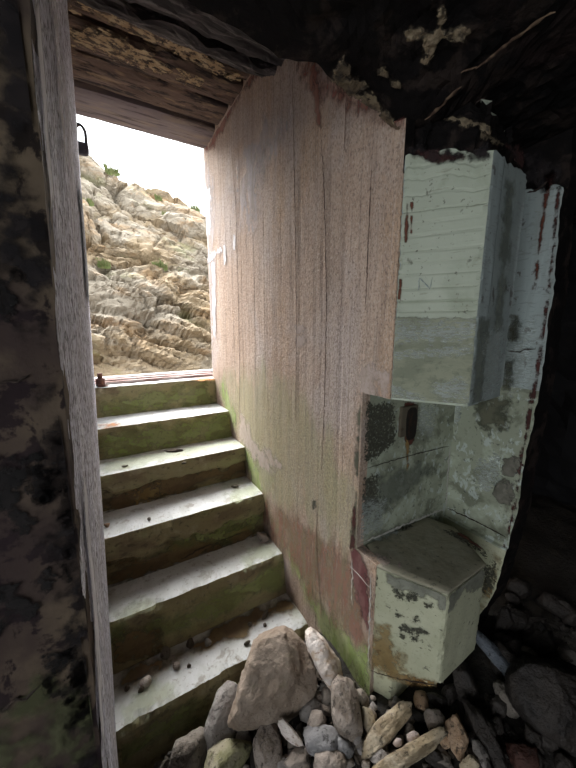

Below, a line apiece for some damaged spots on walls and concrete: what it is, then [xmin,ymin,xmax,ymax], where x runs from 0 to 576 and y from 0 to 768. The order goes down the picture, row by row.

damp [34,1,55,207]
spalling [330,54,401,130]
spalling [404,6,471,65]
spalling [448,116,504,146]
corrosion [404,202,413,243]
corrosion [535,171,560,288]
corrosion [508,299,549,535]
peeling [349,317,489,662]
damp [82,478,105,742]